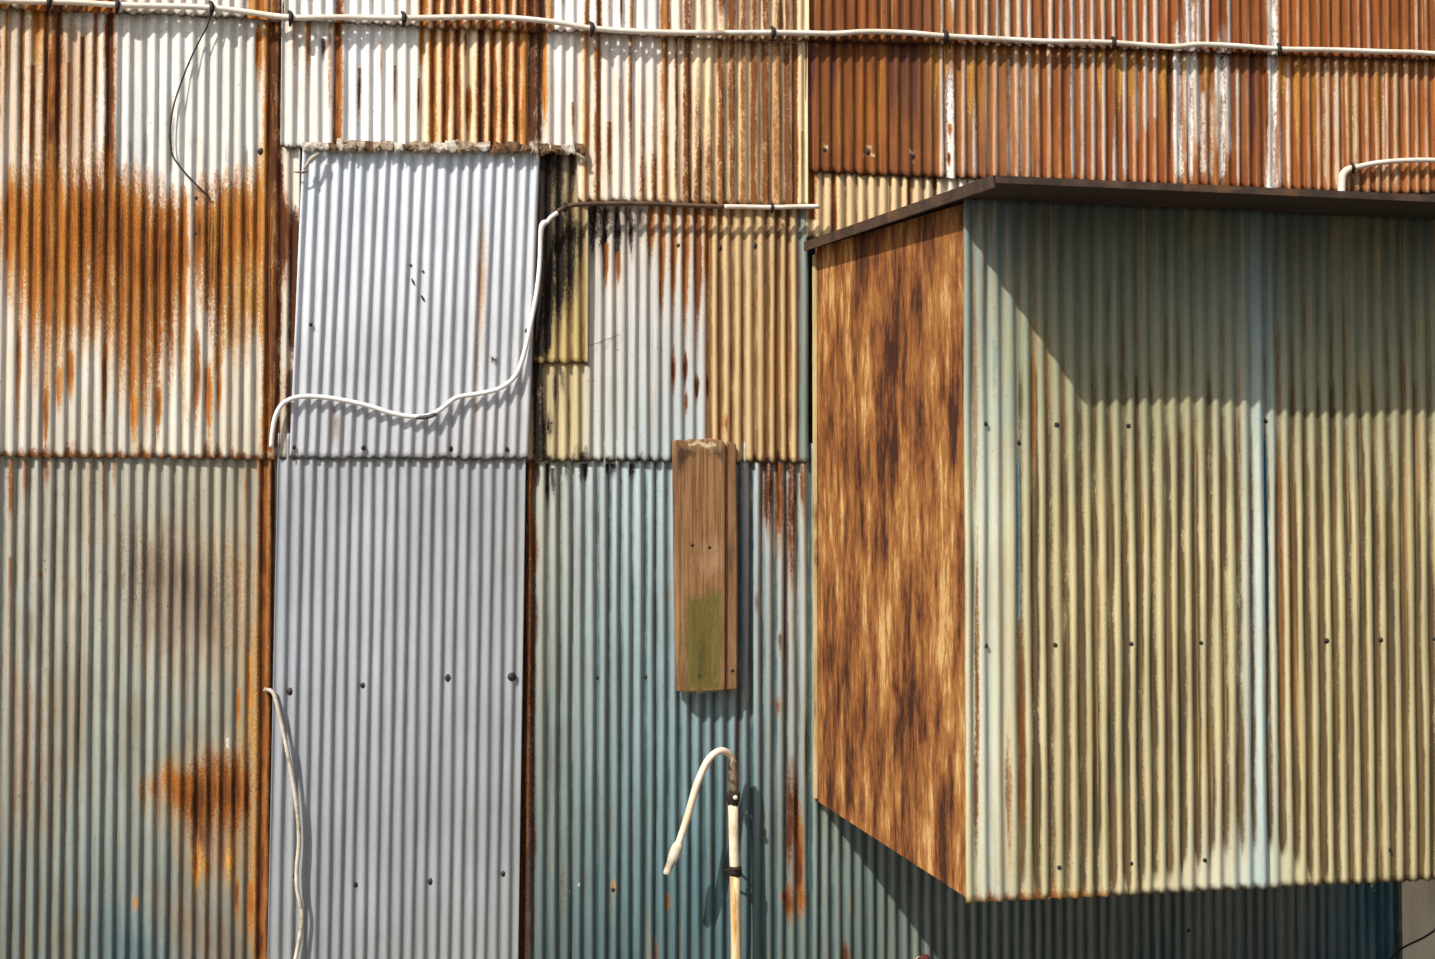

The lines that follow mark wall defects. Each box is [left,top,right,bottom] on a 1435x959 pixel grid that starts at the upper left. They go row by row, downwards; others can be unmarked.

rust [417,0,564,146]
rust [571,0,611,201]
rust [620,0,857,333]
rust [1097,48,1134,112]
rust [1159,51,1228,186]
rust [1250,53,1317,162]
rust [604,243,621,286]
rust [0,0,361,959]
rust [763,463,806,585]
rust [518,461,538,959]
rust [1005,627,1025,828]
rust [782,732,808,922]